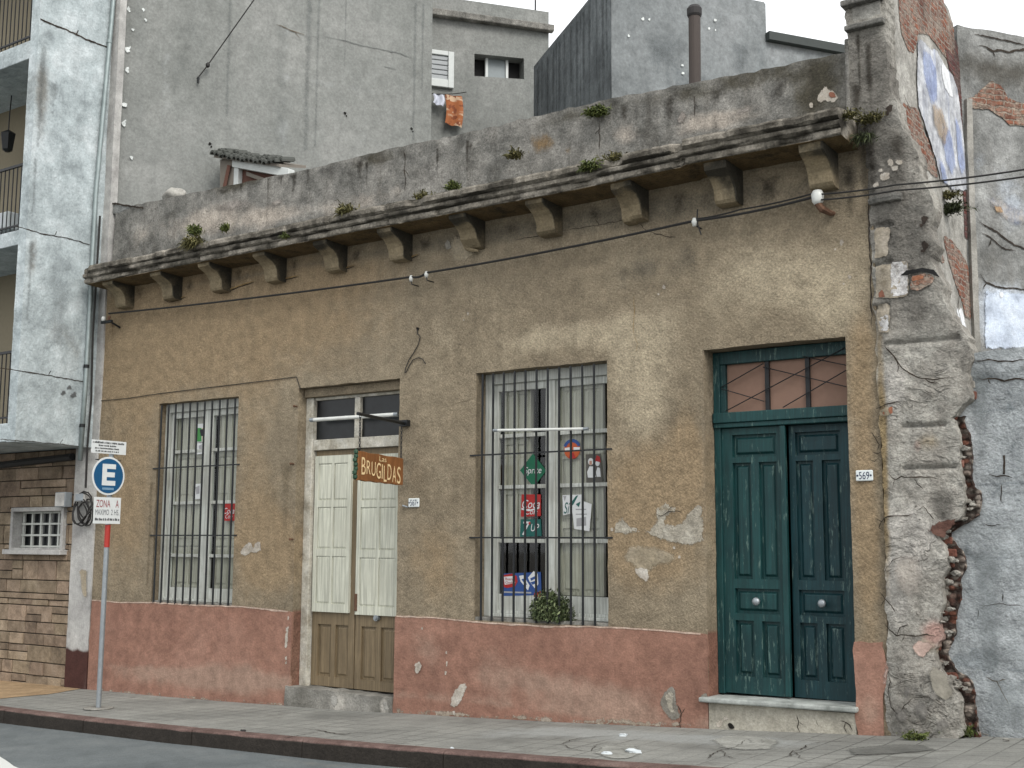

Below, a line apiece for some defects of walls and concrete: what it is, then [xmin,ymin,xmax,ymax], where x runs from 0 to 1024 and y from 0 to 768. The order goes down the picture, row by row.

crack [975,34,1024,56]
spalling [809,87,838,108]
flaking render [885,0,1024,327]
peeling [874,227,934,332]
peeling [241,542,261,556]
peeling [611,503,704,581]
peeling [421,684,553,722]
spalling [570,687,691,726]